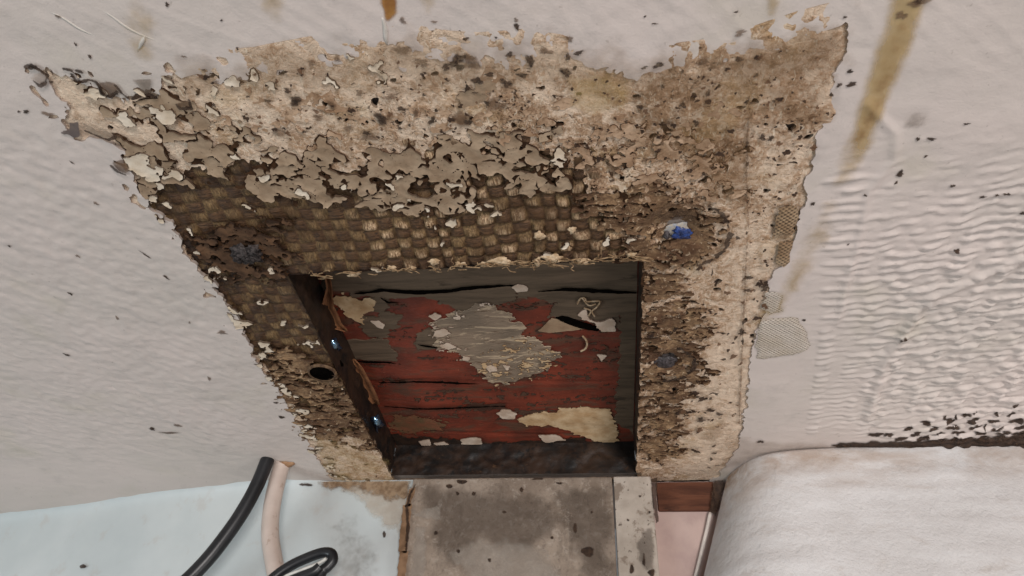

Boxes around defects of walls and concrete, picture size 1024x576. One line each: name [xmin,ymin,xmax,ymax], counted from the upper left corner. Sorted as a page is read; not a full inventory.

peeling [24,3,848,481]
peeling [251,340,424,524]
peeling [868,404,1024,443]